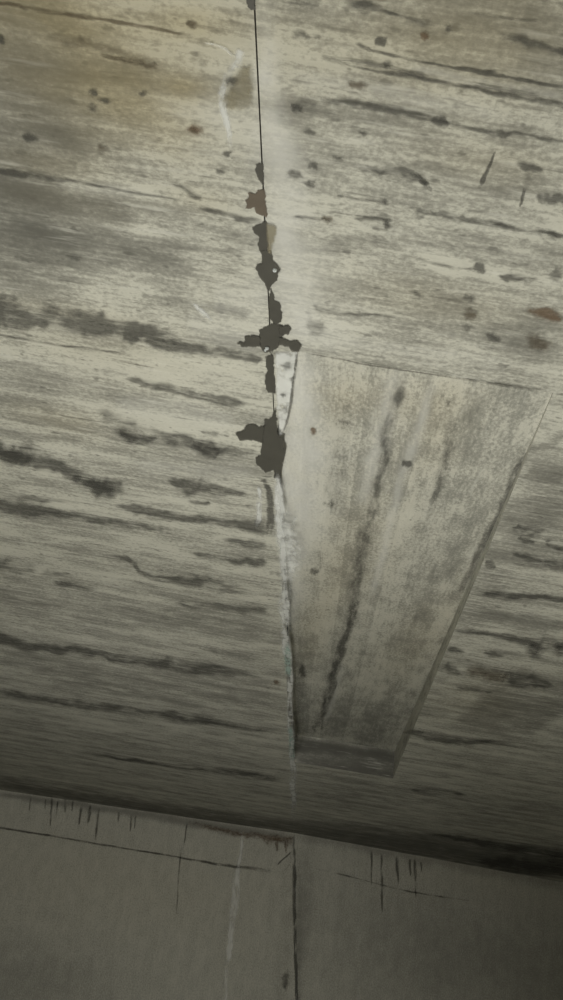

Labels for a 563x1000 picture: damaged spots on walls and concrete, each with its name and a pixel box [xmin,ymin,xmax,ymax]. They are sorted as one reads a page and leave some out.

damp [0,301,212,354]
damp [120,163,302,806]
damp [0,497,73,517]
damp [486,592,563,601]
damp [0,634,169,668]
damp [321,605,355,717]
damp [465,631,563,654]